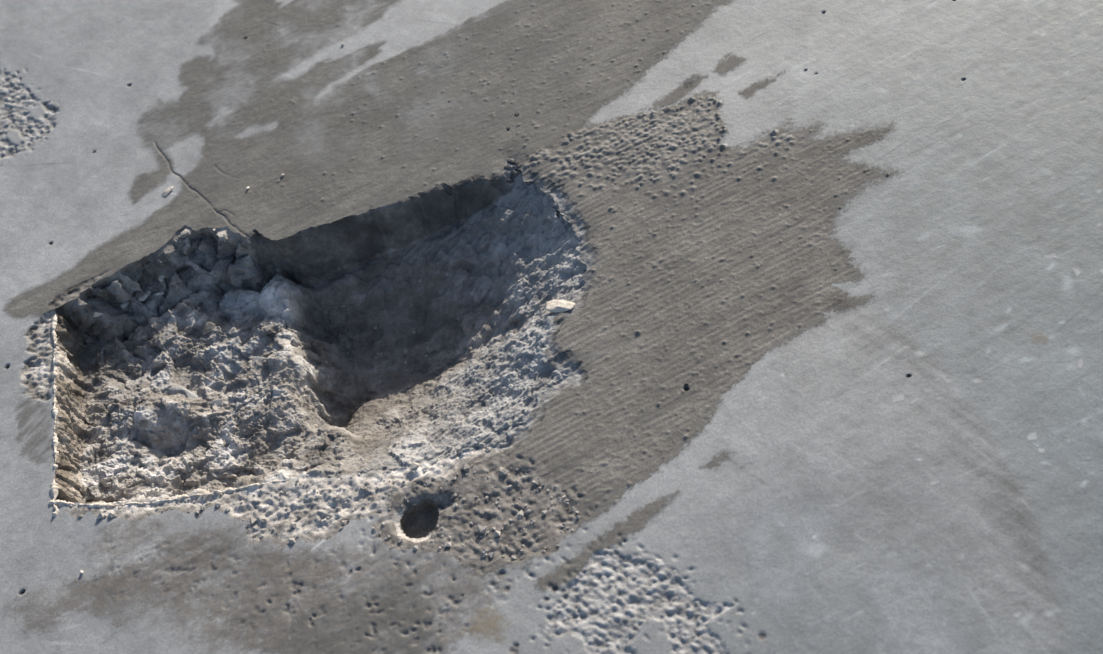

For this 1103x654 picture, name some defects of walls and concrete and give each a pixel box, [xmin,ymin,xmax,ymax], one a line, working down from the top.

spalling [0,67,59,159]
crack [155,142,248,236]
leakage [4,0,897,537]
spalling [20,271,107,401]
spalling [64,154,598,592]
leakage [59,532,533,654]
leakage [535,491,679,591]
spalling [543,547,739,654]
leakage [734,504,839,607]